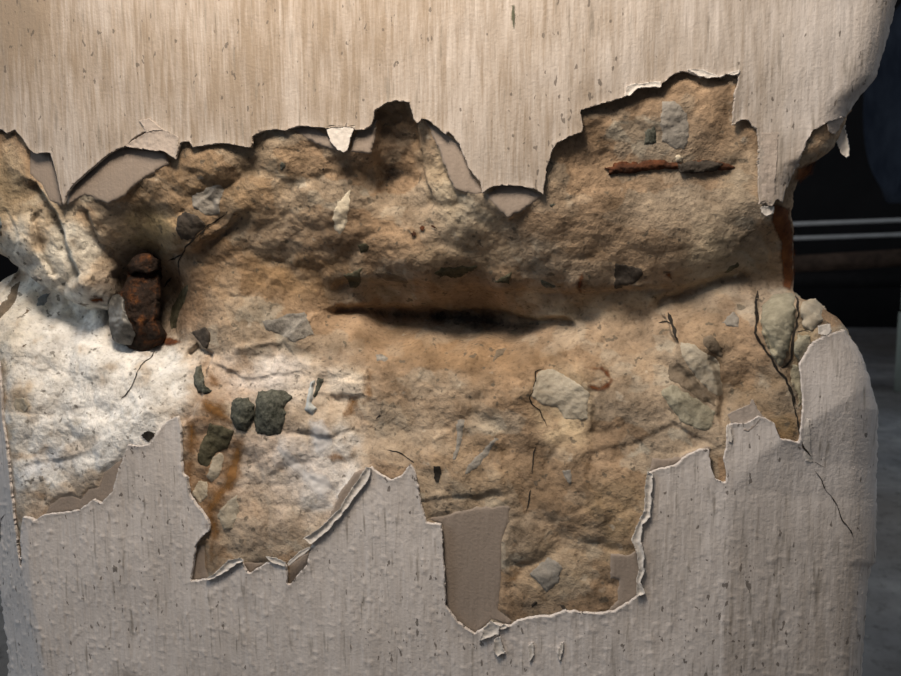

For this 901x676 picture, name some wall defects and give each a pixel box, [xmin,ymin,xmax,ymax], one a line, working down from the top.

spalling [0,130,207,557]
crack [164,214,226,287]
spalling [67,69,852,641]
corrosion [772,204,795,289]
crack [754,291,853,536]
peeling [493,636,506,657]